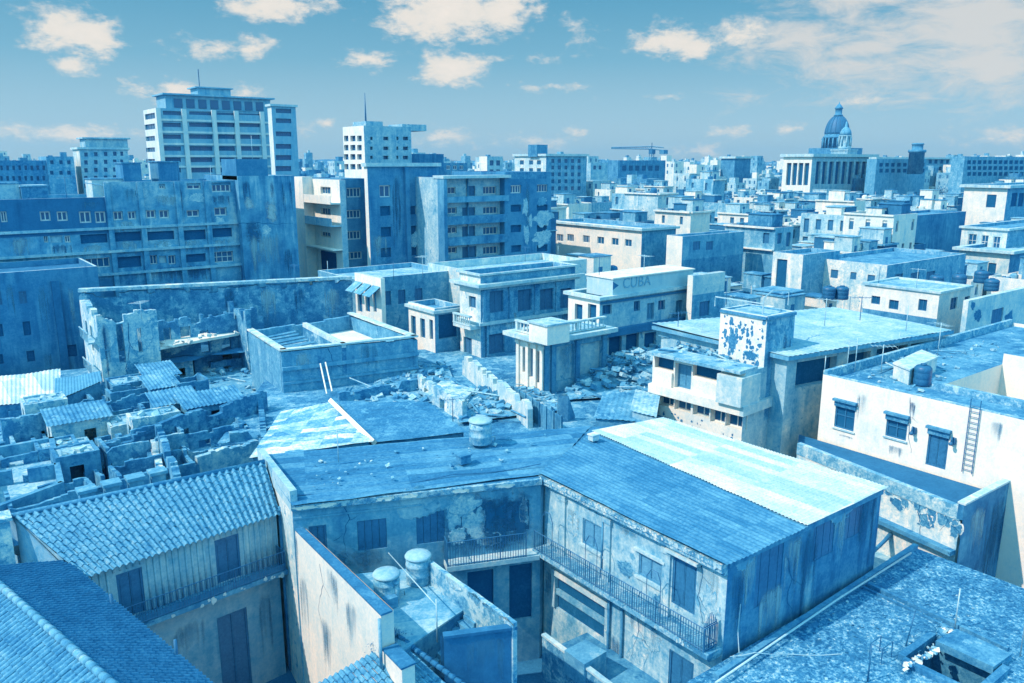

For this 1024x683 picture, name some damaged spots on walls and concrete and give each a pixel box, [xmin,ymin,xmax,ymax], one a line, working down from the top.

peeling [522,197,555,248]
peeling [721,315,794,366]
peeling [375,485,501,546]
peeling [495,483,529,525]
spalling [884,490,964,541]